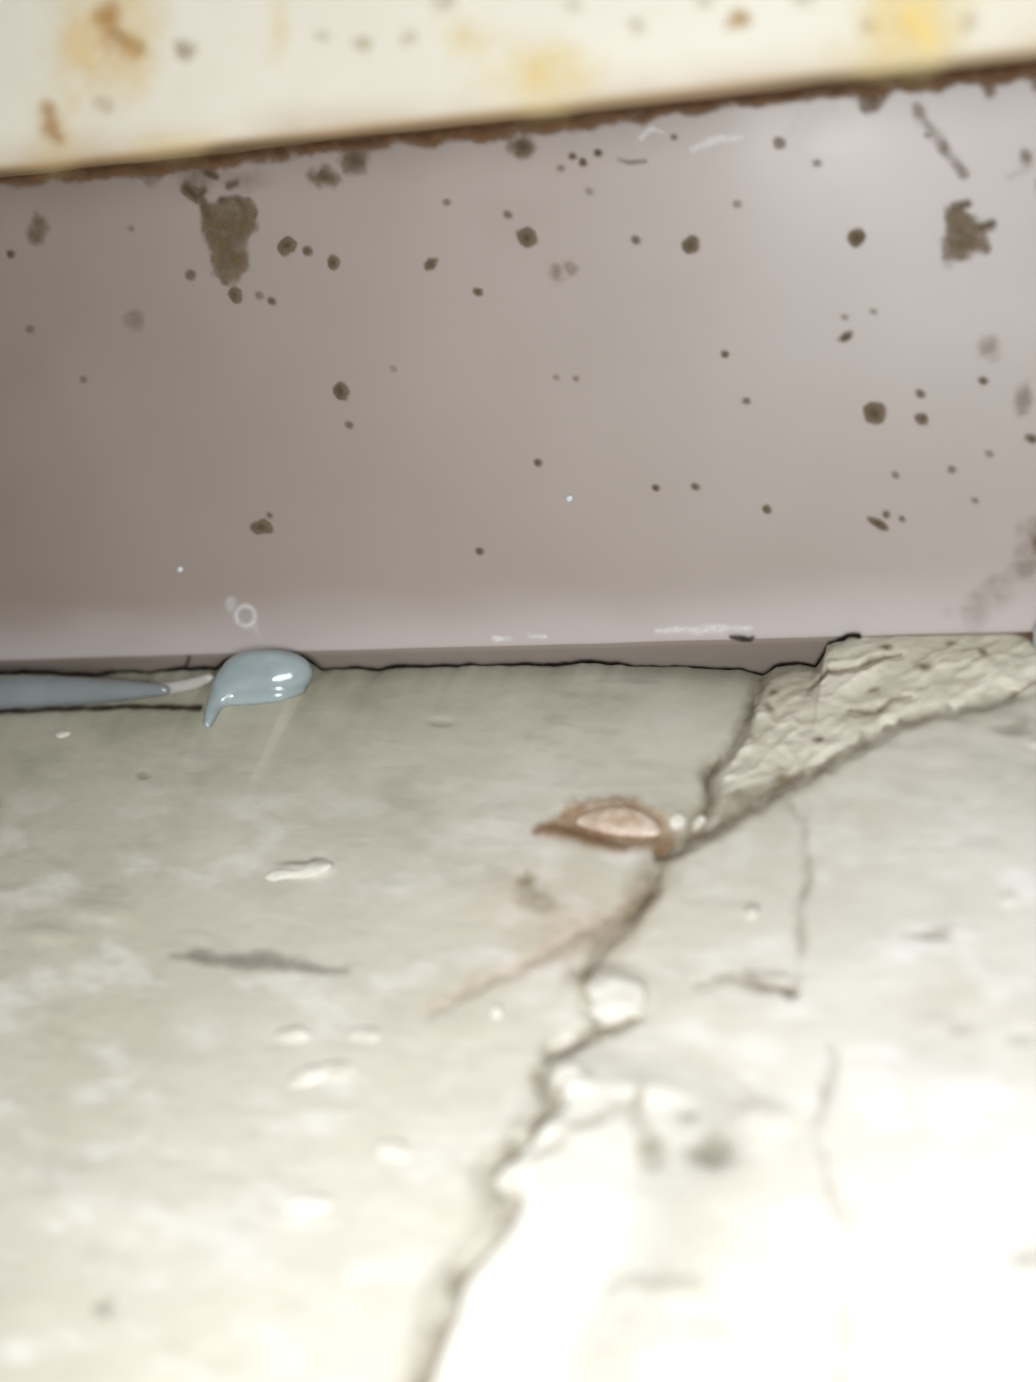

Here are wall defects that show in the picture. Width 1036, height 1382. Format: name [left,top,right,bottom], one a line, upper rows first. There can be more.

corrosion [82,5,140,58]
corrosion [732,12,748,25]
corrosion [0,62,1036,186]
crack [0,657,231,714]
crack [302,633,861,714]
flaking render [715,634,1036,793]
crack [687,758,835,842]
crack [751,981,796,997]
crack [552,1018,641,1056]